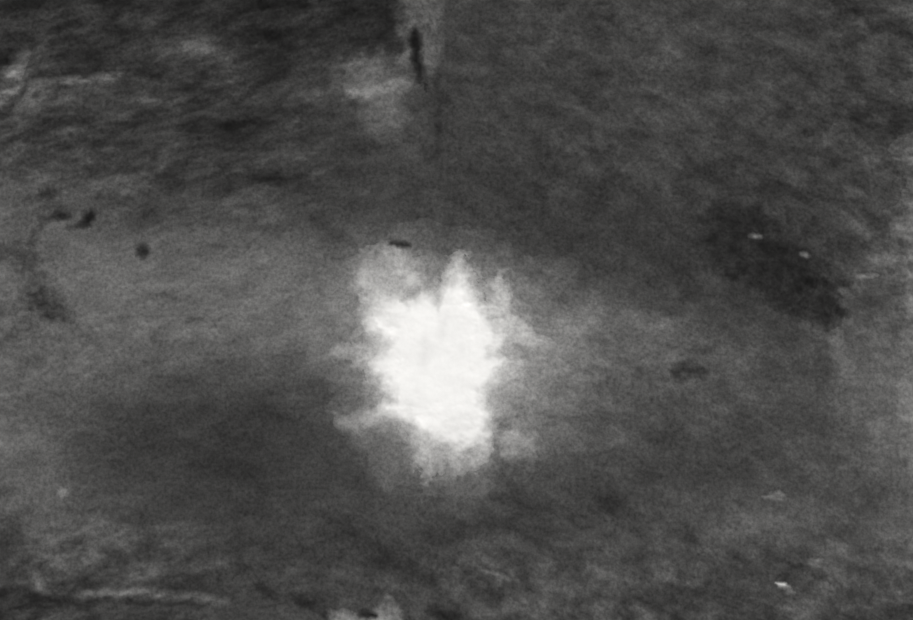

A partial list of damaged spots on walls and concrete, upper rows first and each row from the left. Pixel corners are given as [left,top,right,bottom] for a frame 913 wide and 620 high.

crack [408,26,445,160]
peeling [306,218,609,506]
spalling [356,608,379,620]